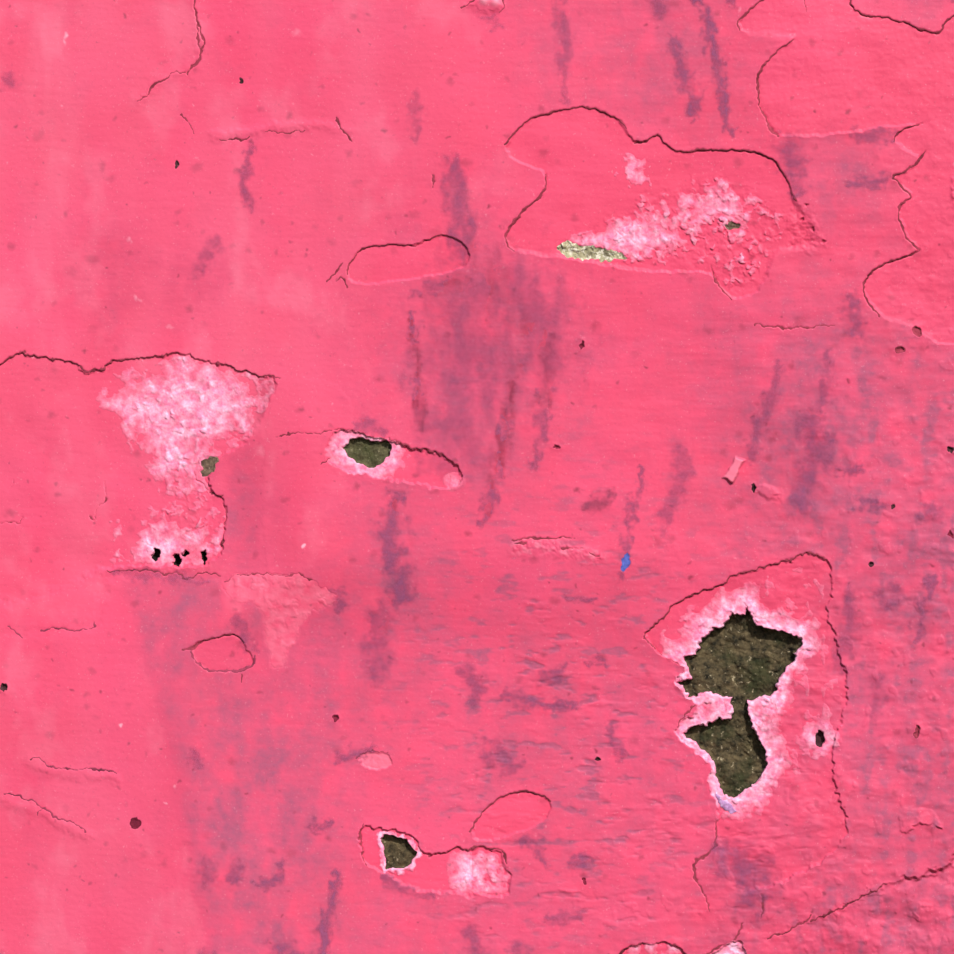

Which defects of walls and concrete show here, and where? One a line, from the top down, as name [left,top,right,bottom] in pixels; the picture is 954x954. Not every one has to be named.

crack [137,0,205,101]
peeling [504,106,814,300]
crack [754,322,835,330]
spalling [280,428,466,492]
peeling [0,350,337,668]
spalling [643,551,848,890]
spalling [358,790,551,898]
peeling [619,941,686,954]
crack [692,819,720,911]
peeling [710,940,750,954]
crack [706,894,812,954]
spalling [787,859,954,954]